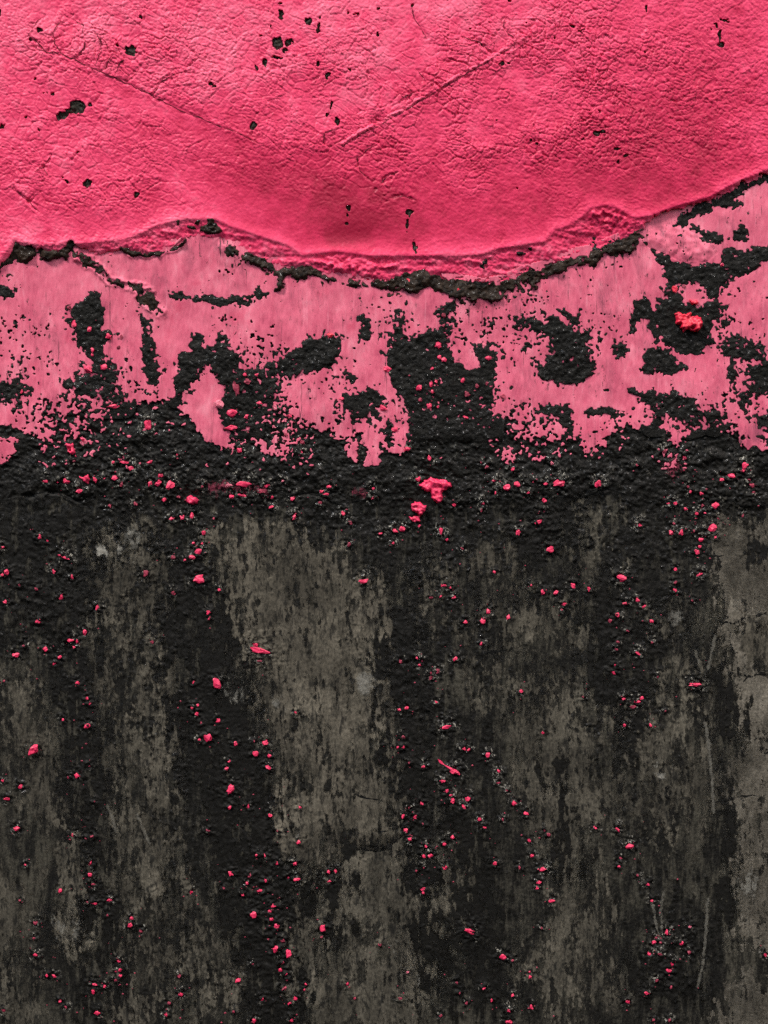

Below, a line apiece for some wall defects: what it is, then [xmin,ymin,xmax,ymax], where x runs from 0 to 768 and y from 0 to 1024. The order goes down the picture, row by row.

peeling [0,0,768,494]
water stain [96,530,140,557]
water stain [357,672,371,693]
water stain [703,668,753,748]
water stain [311,868,359,947]
water stain [400,797,516,1020]